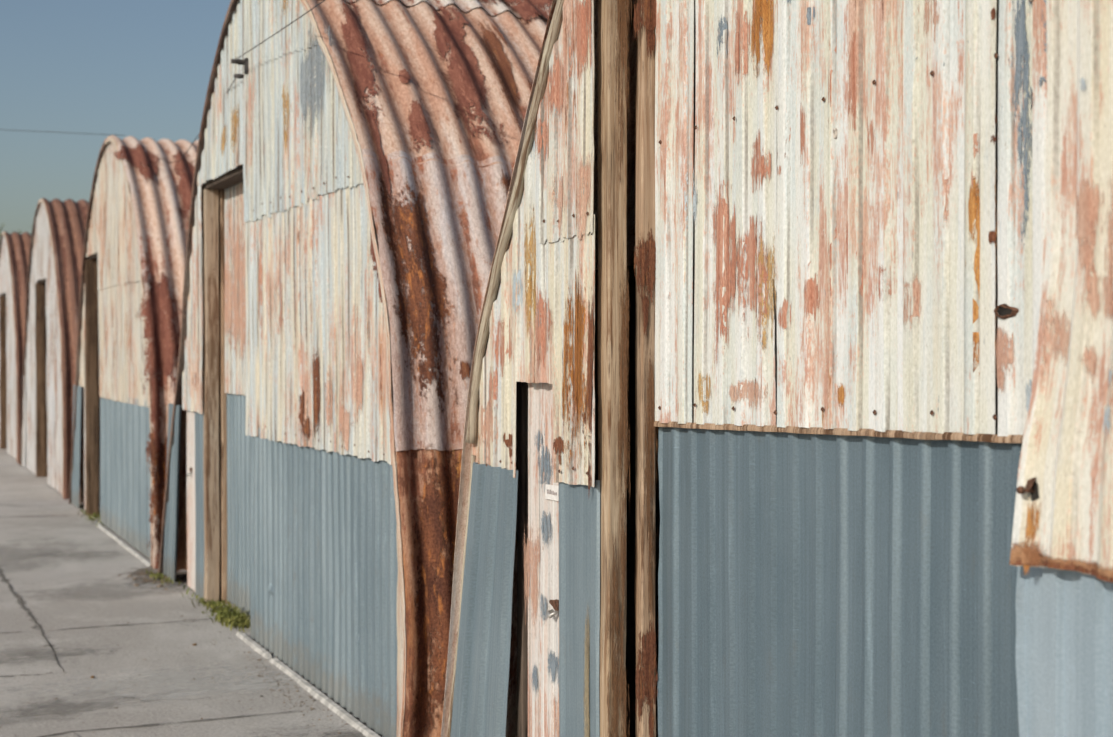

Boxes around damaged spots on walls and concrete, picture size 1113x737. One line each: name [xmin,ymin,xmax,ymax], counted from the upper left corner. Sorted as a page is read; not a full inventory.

rust [113,143,194,235]
rust [341,0,470,414]
rust [430,0,592,160]
rust [552,155,591,240]
peeling [684,168,698,228]
peeling [717,15,728,55]
peeling [1008,0,1047,242]
rust [1076,179,1113,321]
rust [1040,298,1096,375]
rust [135,269,182,549]
rust [409,446,461,735]
rust [1009,500,1113,583]